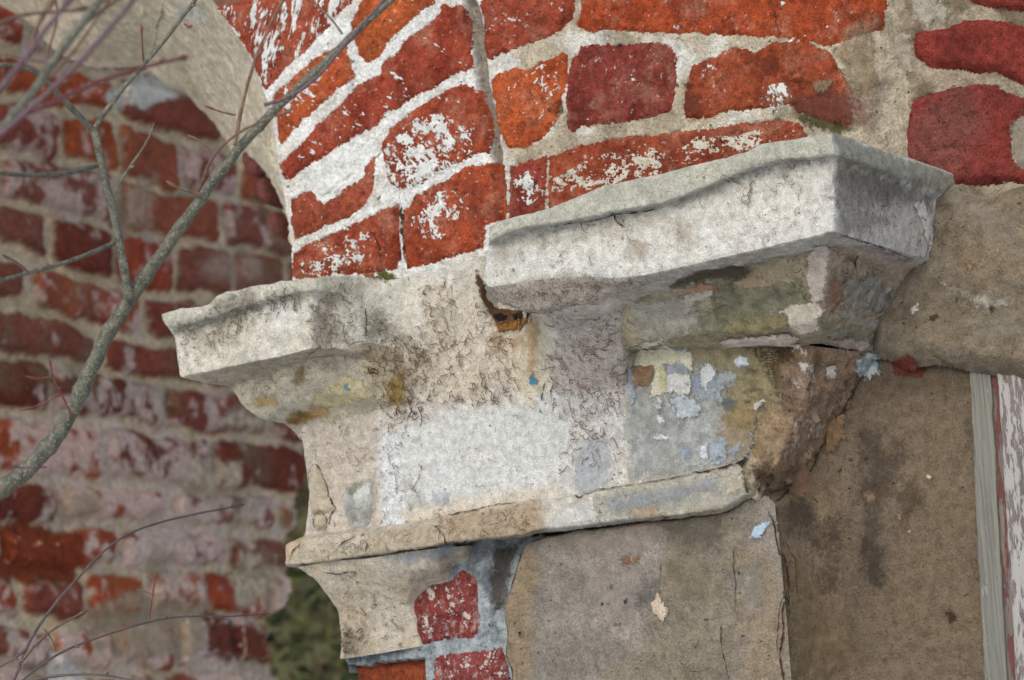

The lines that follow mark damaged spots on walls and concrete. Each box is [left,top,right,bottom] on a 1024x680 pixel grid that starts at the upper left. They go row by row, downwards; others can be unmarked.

crack [698,158,934,320]
flaking render [914,200,934,251]
crack [167,206,761,653]
spalling [543,245,918,529]
water stain [752,462,775,491]
crack [810,375,858,472]
crack [767,488,798,680]